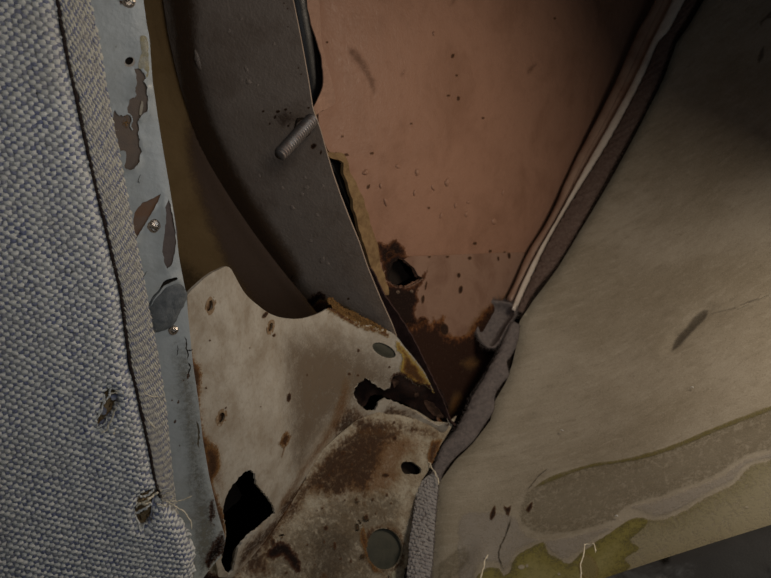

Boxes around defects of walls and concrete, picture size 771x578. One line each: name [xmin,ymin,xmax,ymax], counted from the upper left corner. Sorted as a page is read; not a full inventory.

peeling [113,68,148,170]
peeling [133,195,178,268]
corrosion [192,352,226,578]
corrosion [233,239,507,578]
damp [458,461,771,578]
damp [536,406,771,487]